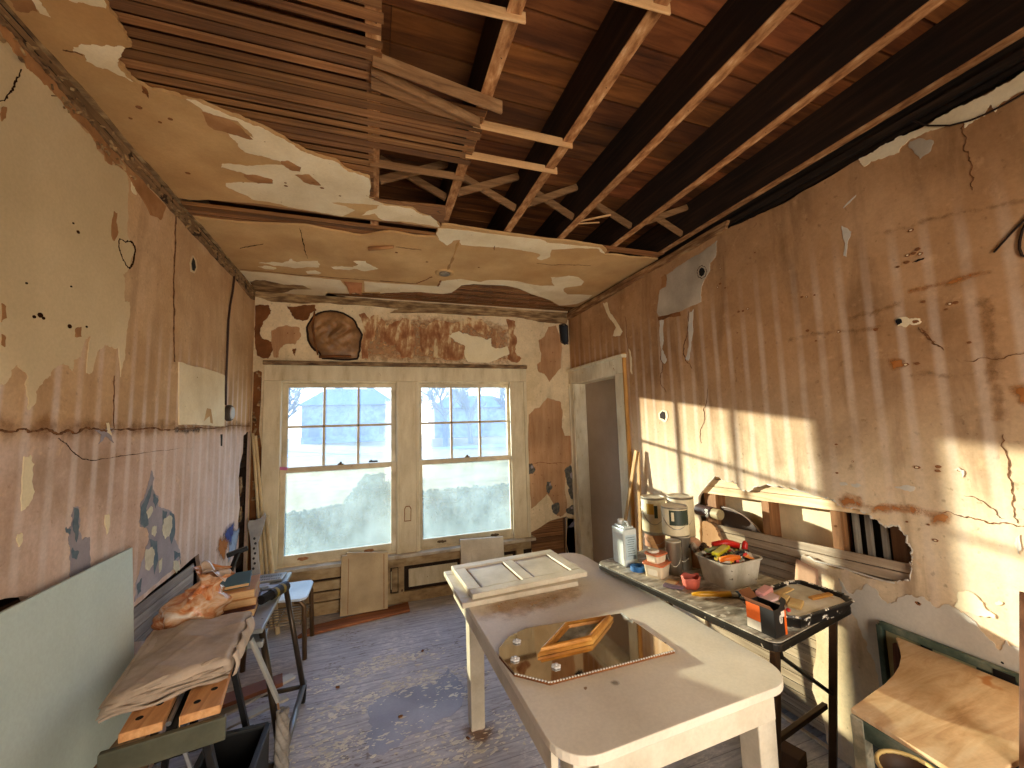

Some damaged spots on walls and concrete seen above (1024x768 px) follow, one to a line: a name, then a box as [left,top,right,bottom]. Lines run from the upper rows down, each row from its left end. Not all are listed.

peeling [859,71,1024,167]
crack [960,123,974,189]
flaking render [657,241,721,320]
crack [0,376,241,461]
peeling [235,259,592,571]
crack [939,436,1024,527]
spalling [697,476,1019,688]
spalling [707,621,826,734]